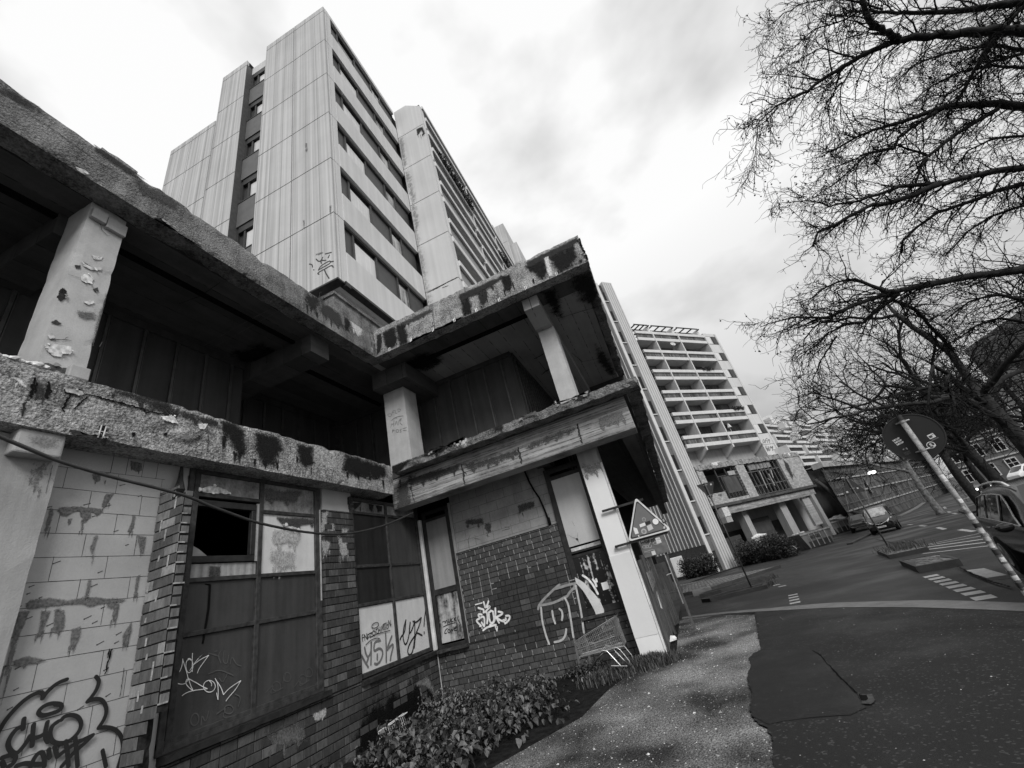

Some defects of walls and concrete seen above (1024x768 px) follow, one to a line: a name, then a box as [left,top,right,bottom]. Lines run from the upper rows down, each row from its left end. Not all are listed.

peeling [75,255,103,305]
damp [532,250,598,317]
peeling [38,320,74,374]